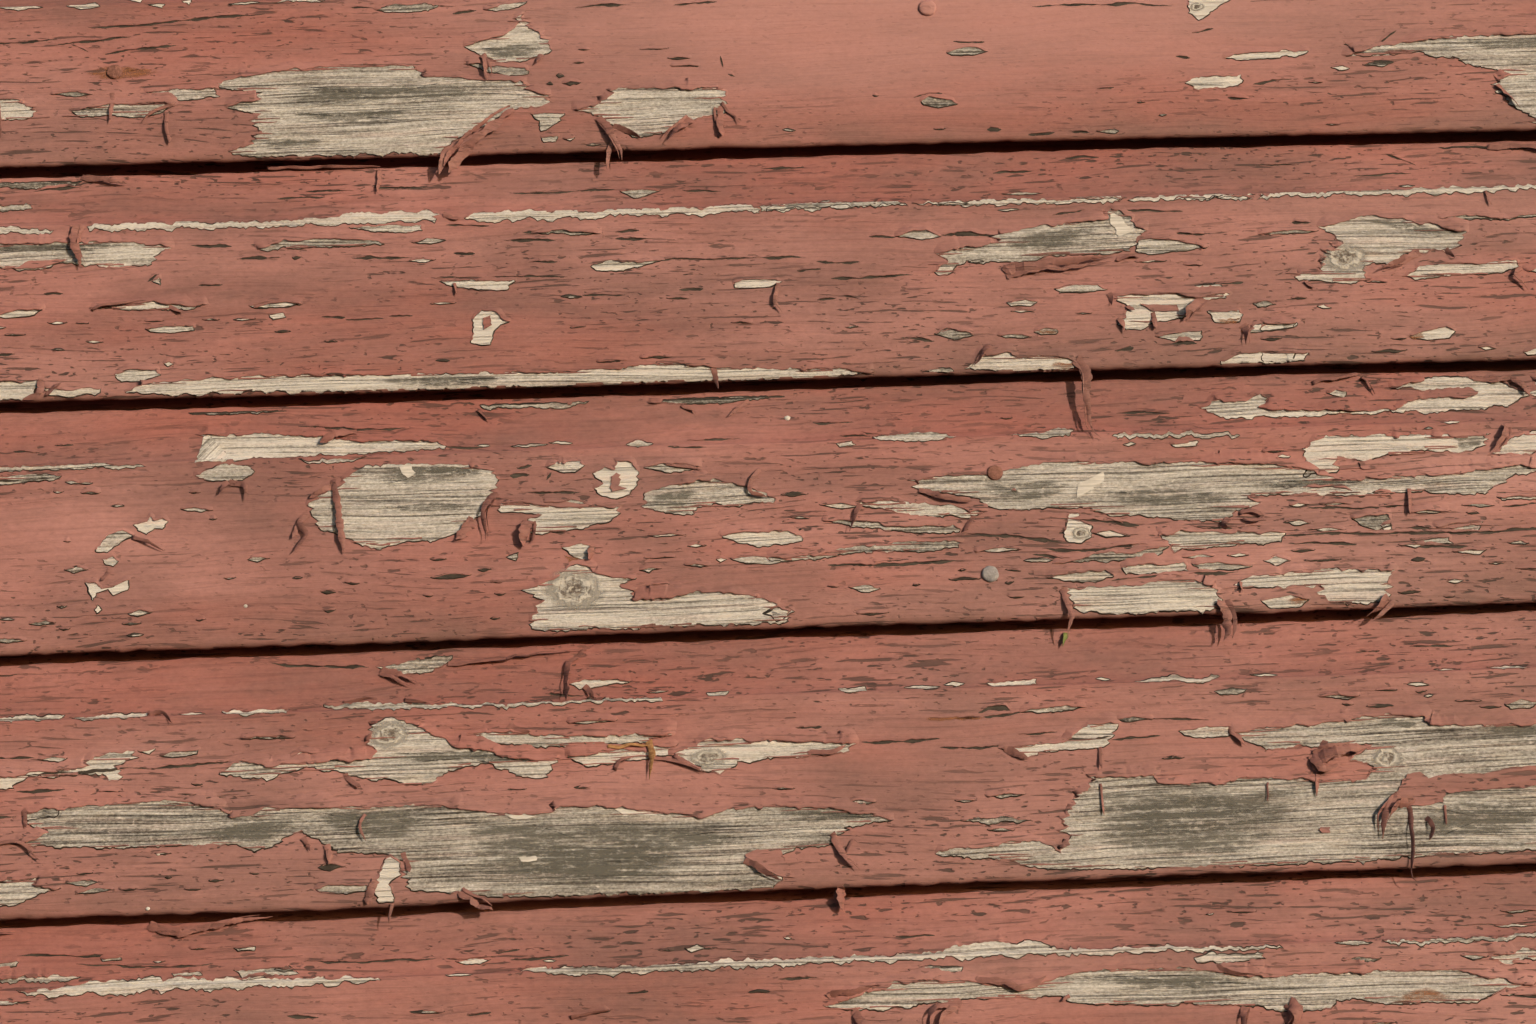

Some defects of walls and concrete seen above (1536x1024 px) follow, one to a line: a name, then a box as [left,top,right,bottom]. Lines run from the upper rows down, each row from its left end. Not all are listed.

peeling [1187,0,1231,21]
peeling [0,1,740,174]
peeling [1184,45,1310,92]
peeling [1330,24,1536,124]
peeling [0,175,1536,290]
peeling [89,291,209,334]
peeling [439,273,517,346]
peeling [731,275,783,312]
peeling [1007,281,1311,366]
peeling [0,321,1536,923]
peeling [0,945,381,1006]
peeling [519,904,1536,1024]